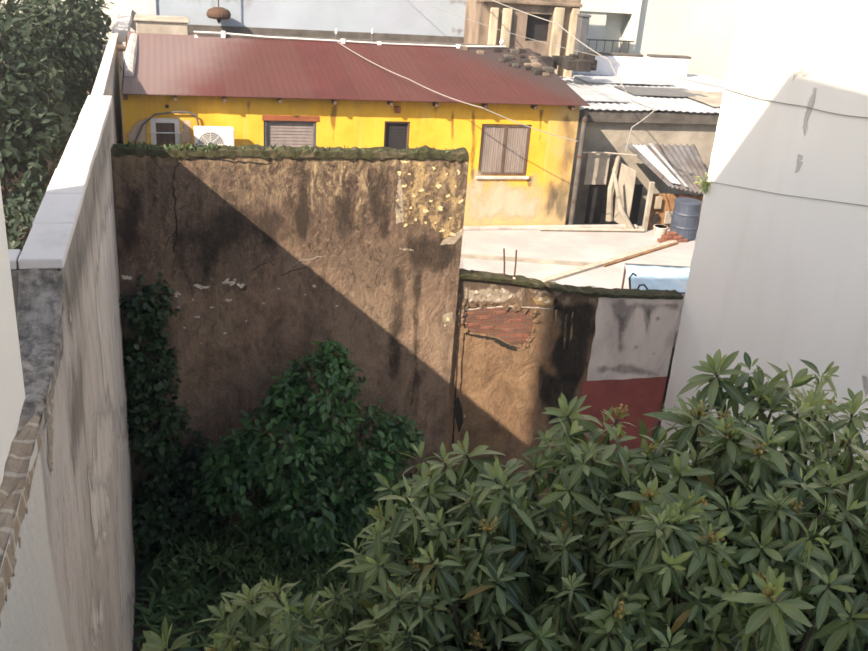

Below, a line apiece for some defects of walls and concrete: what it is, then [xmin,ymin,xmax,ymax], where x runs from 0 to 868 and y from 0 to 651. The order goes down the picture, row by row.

crack [166,157,273,253]
leakage [297,172,308,238]
leakage [368,173,389,237]
peeling [395,159,540,245]
leakage [174,207,280,277]
leakage [408,237,455,325]
leakage [390,305,402,376]
spalling [443,288,555,351]
leakage [539,300,595,431]